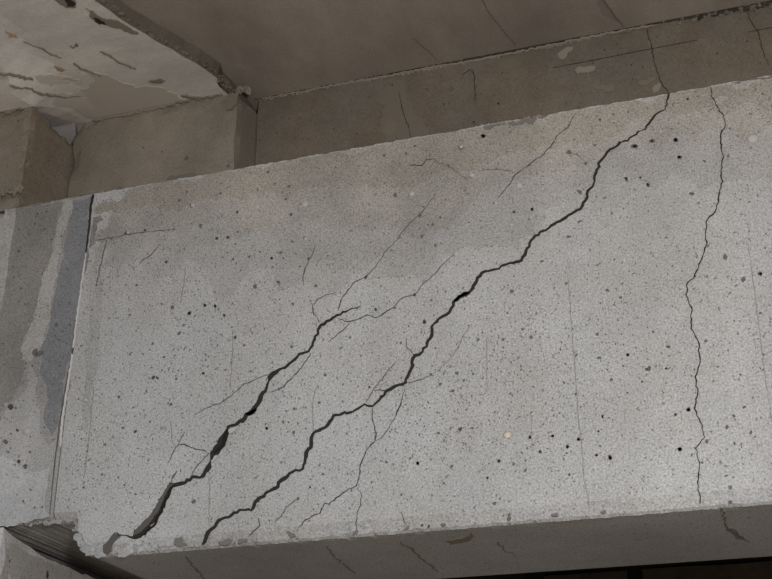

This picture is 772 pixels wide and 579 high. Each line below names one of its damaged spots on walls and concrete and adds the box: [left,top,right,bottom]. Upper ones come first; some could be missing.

spalling [55,0,252,96]
crack [49,194,171,515]
spalling [133,484,174,535]
damp [0,76,772,444]
crack [115,28,670,545]
crack [685,87,737,503]
crack [720,508,749,542]